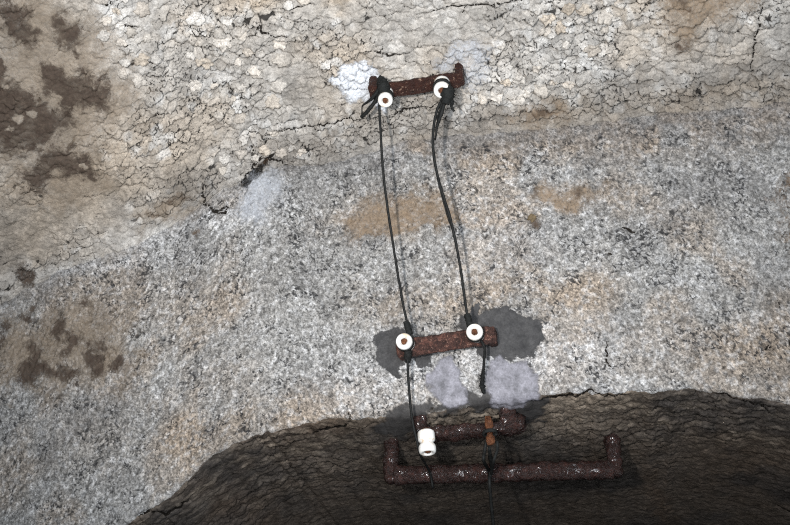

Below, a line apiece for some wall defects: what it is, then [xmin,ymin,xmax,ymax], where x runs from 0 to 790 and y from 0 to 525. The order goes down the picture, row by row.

water stain [0,0,41,49]
crack [236,24,287,56]
crack [428,0,522,13]
crack [750,4,763,69]
water stain [0,11,111,193]
crack [241,117,360,183]
crack [201,184,231,215]
water stain [17,318,124,384]